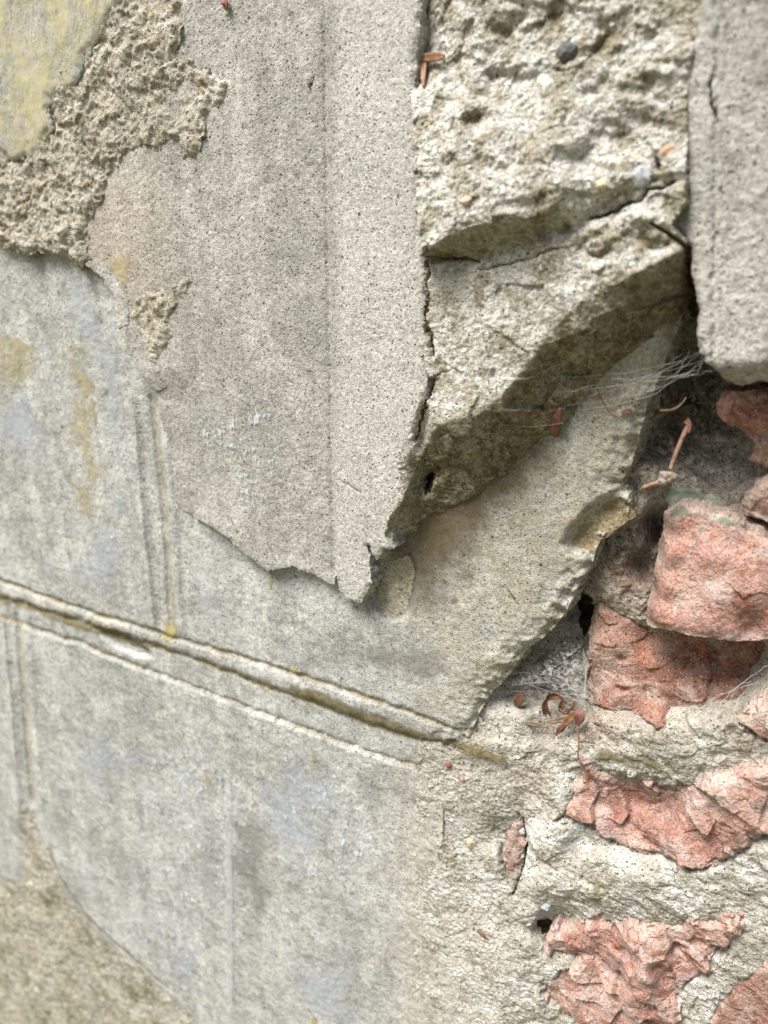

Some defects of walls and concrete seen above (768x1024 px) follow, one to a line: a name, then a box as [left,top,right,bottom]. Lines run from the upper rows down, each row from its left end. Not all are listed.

spalling [0,0,235,390]
crack [416,248,555,440]
spalling [384,0,768,1024]
crack [592,158,676,220]